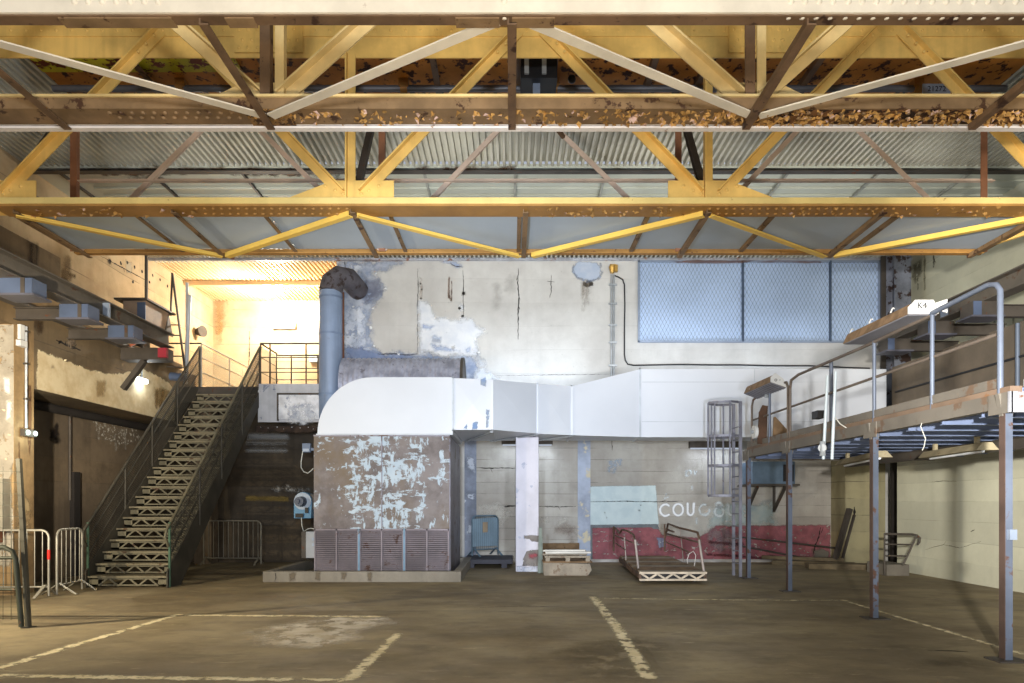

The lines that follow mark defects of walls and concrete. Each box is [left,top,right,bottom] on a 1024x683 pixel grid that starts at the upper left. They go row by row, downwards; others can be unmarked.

flaking render [338,261,495,386]
crack [514,269,522,335]